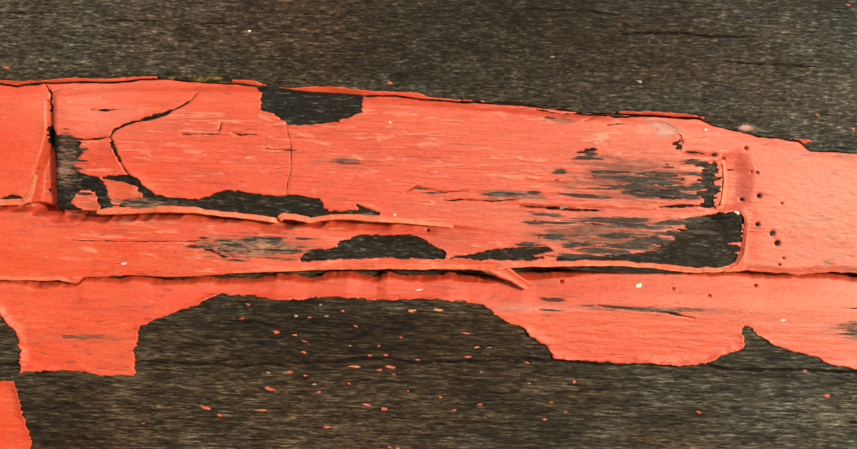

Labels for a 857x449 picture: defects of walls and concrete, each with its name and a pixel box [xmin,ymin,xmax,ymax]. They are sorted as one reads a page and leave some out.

peeling [0,174,37,205]
crack [0,77,167,112]
crack [63,95,196,189]
crack [182,125,295,188]
peeling [45,126,760,290]
peeling [0,0,857,153]
crack [366,95,711,155]
peeling [0,293,857,449]